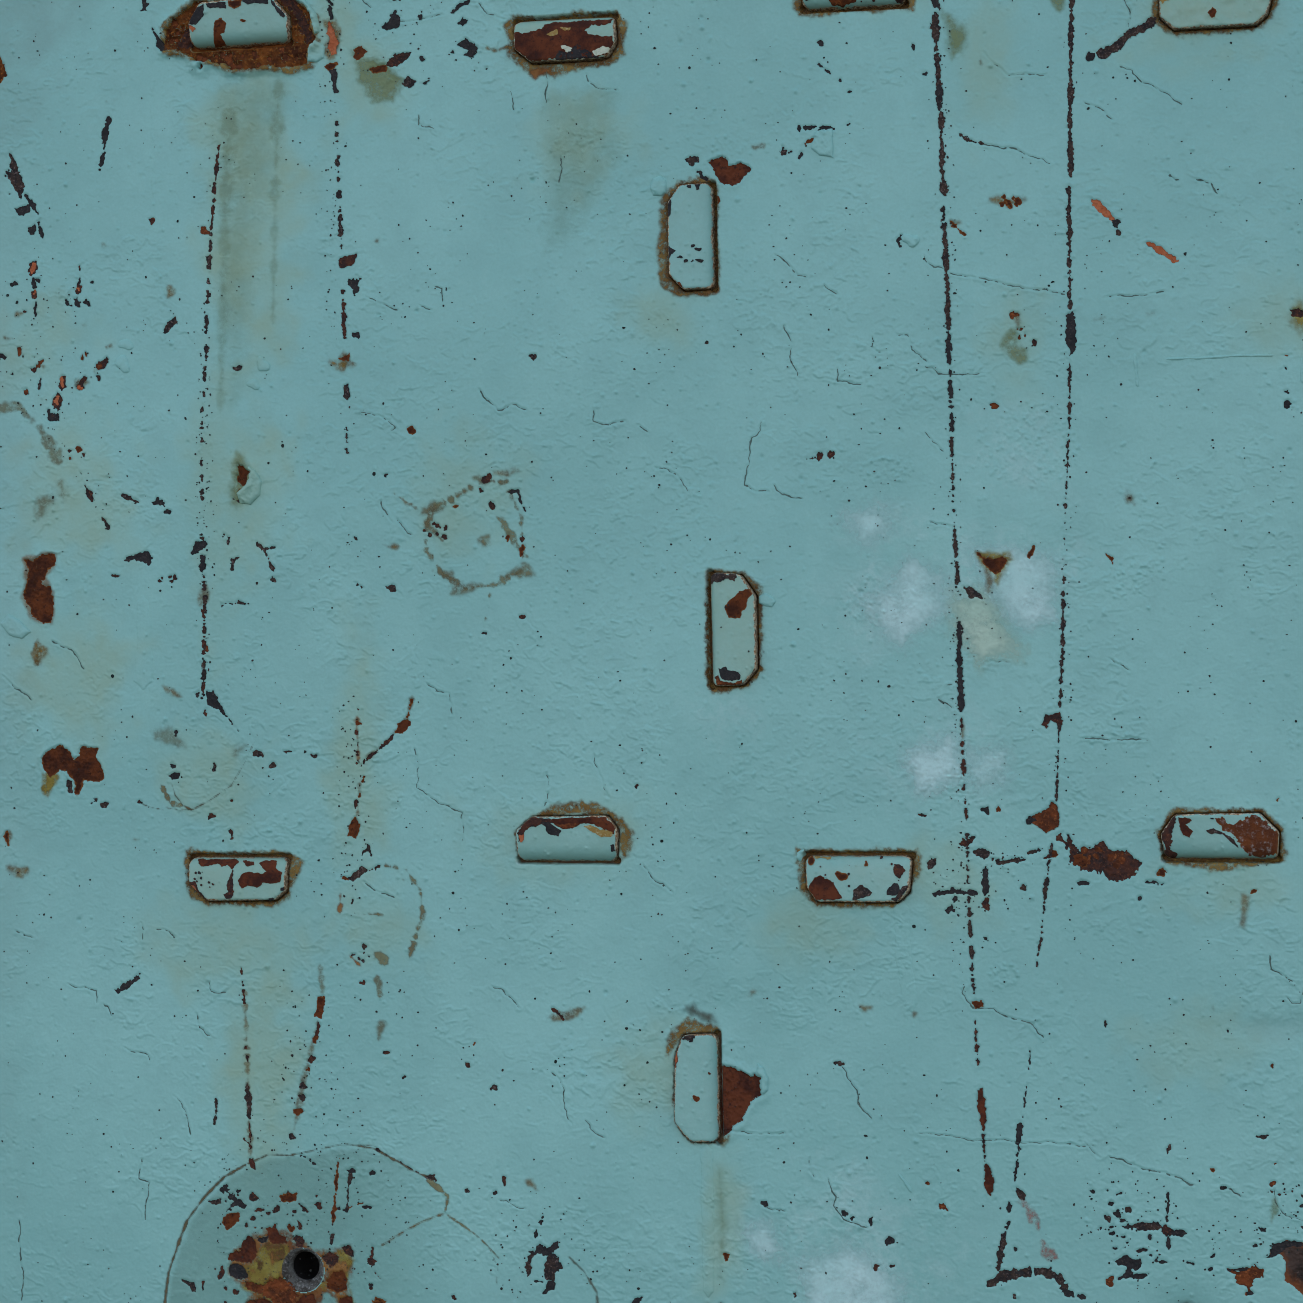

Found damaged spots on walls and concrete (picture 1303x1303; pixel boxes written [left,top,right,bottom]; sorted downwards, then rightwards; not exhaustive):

corrosion [160,0,341,74]
corrosion [947,16,964,54]
corrosion [1152,0,1278,36]
corrosion [1004,316,1026,364]
peeling [0,153,307,704]
peeling [66,769,109,808]
peeling [916,763,1134,1012]
peeling [465,1151,605,1298]
corrosion [228,1224,354,1303]
corrosion [1227,1240,1303,1296]